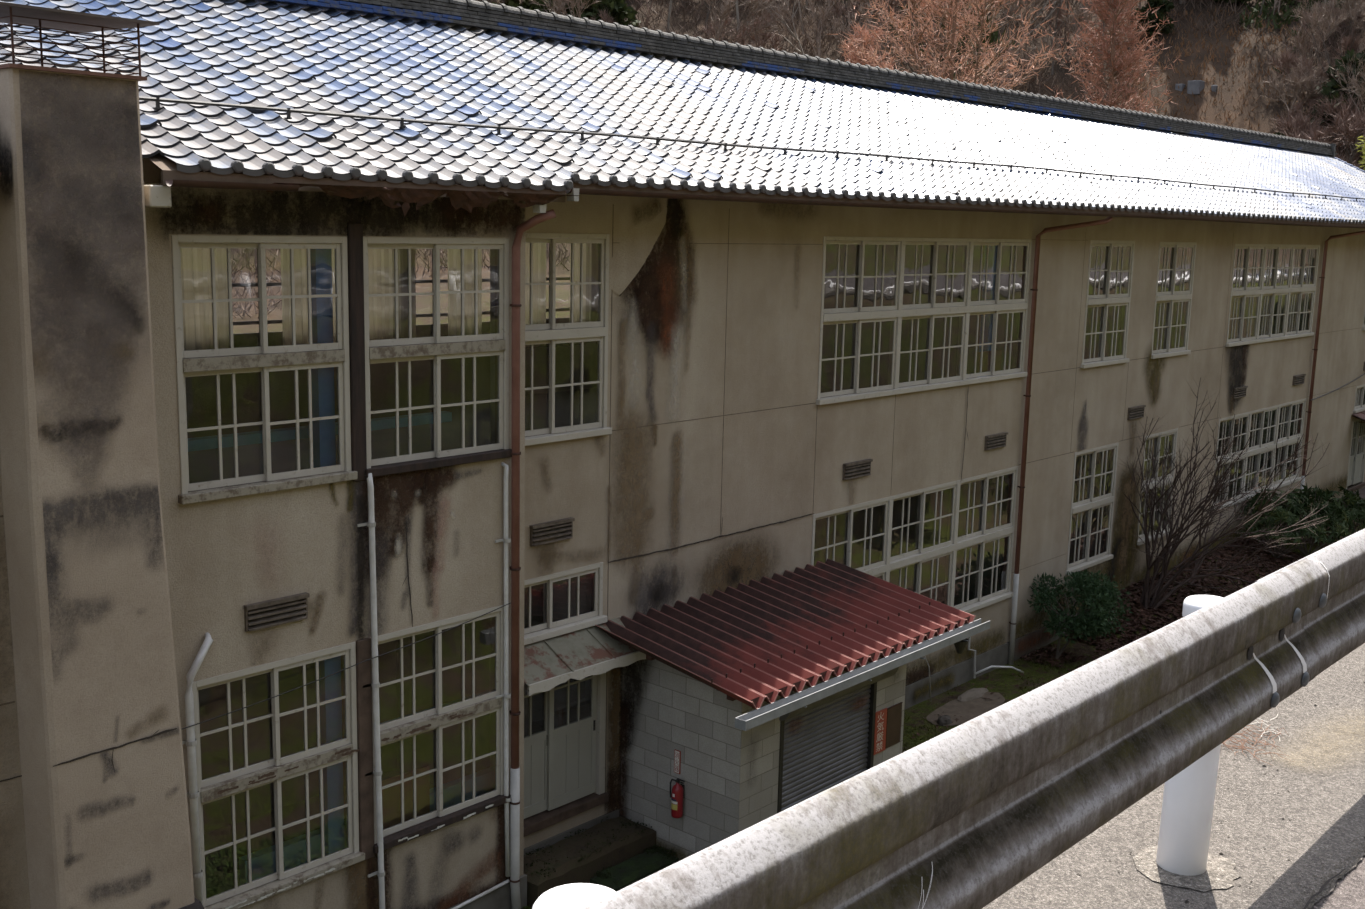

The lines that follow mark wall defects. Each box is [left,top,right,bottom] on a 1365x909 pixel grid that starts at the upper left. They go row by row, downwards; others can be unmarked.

damp [443,197,525,235]
rust [623,199,693,421]
damp [43,486,163,620]
damp [608,321,657,601]
damp [671,433,681,553]
crack [53,728,177,772]